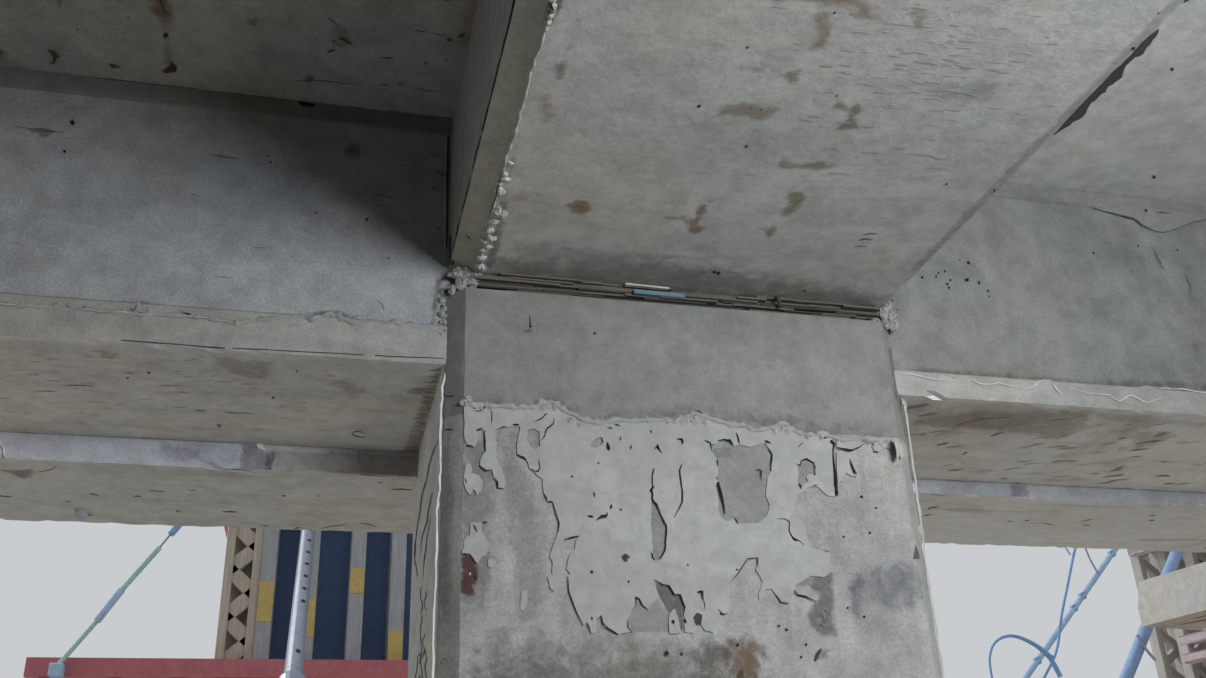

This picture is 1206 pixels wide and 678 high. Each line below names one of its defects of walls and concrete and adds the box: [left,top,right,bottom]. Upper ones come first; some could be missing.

corrosion [461,556,480,595]
peeling [432,373,878,678]
spalling [894,398,945,678]